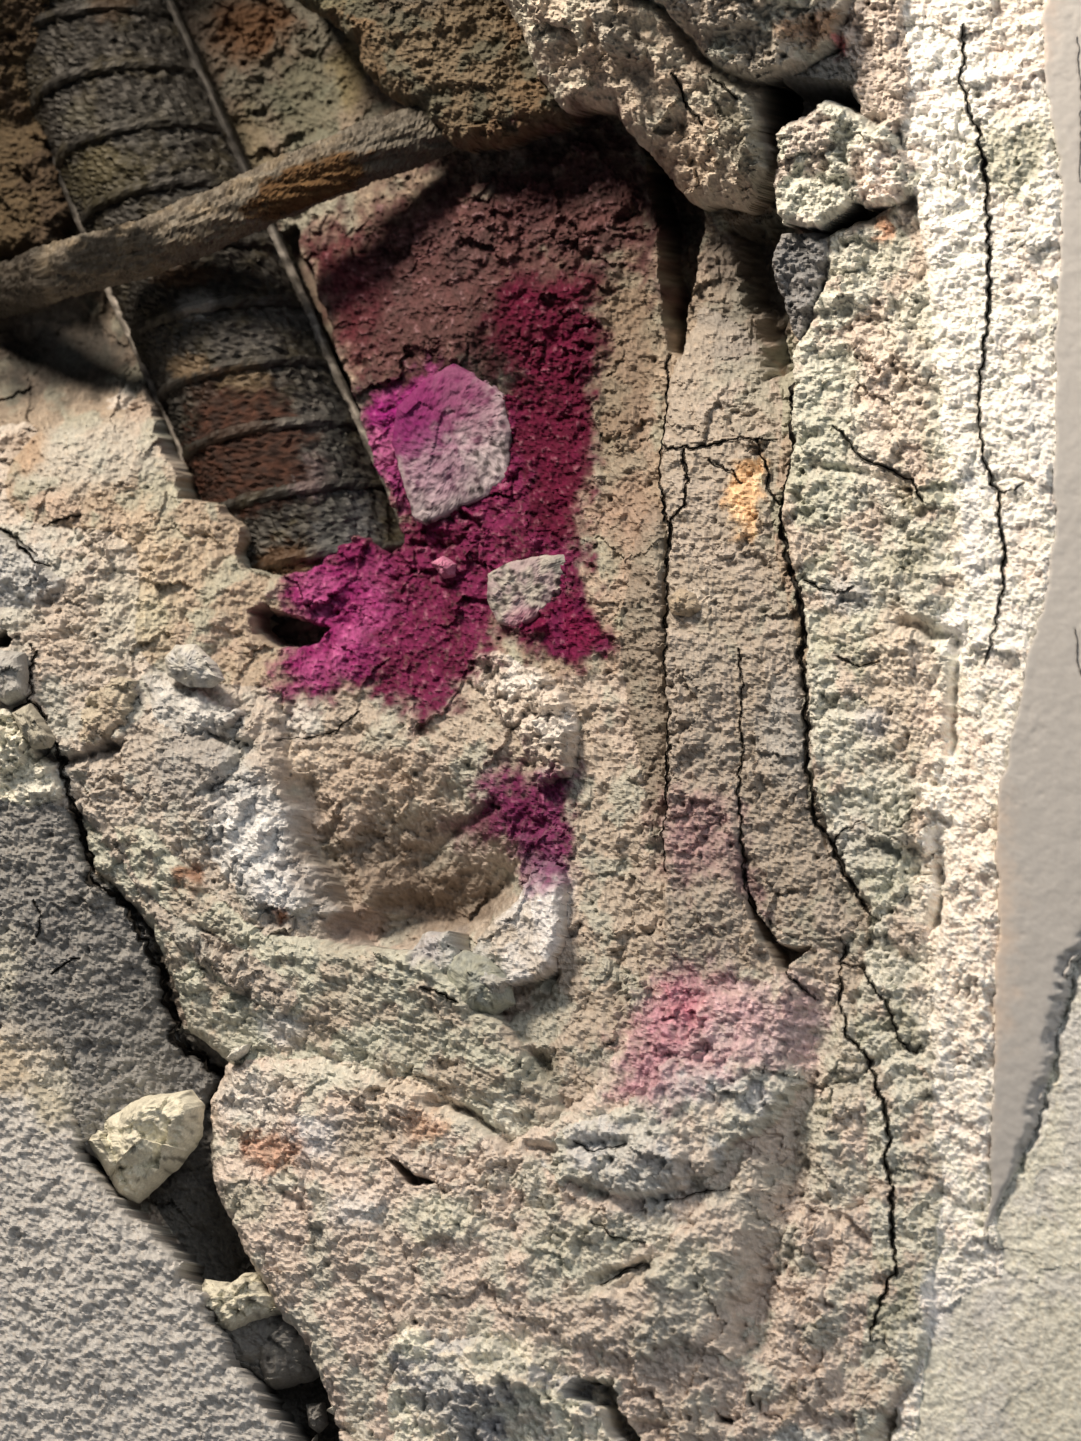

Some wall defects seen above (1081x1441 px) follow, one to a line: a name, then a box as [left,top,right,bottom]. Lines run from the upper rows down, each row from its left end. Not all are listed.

spalling [0,0,406,262]
rust [183,385,320,519]
rust [239,150,373,221]
spalling [0,118,706,576]
spalling [567,349,606,632]
crack [671,73,736,125]
crack [958,24,1023,665]
crack [13,644,256,1343]
spalling [259,603,614,944]
crack [658,356,923,1341]
flaking render [840,0,1081,1441]
crack [252,1377,341,1441]